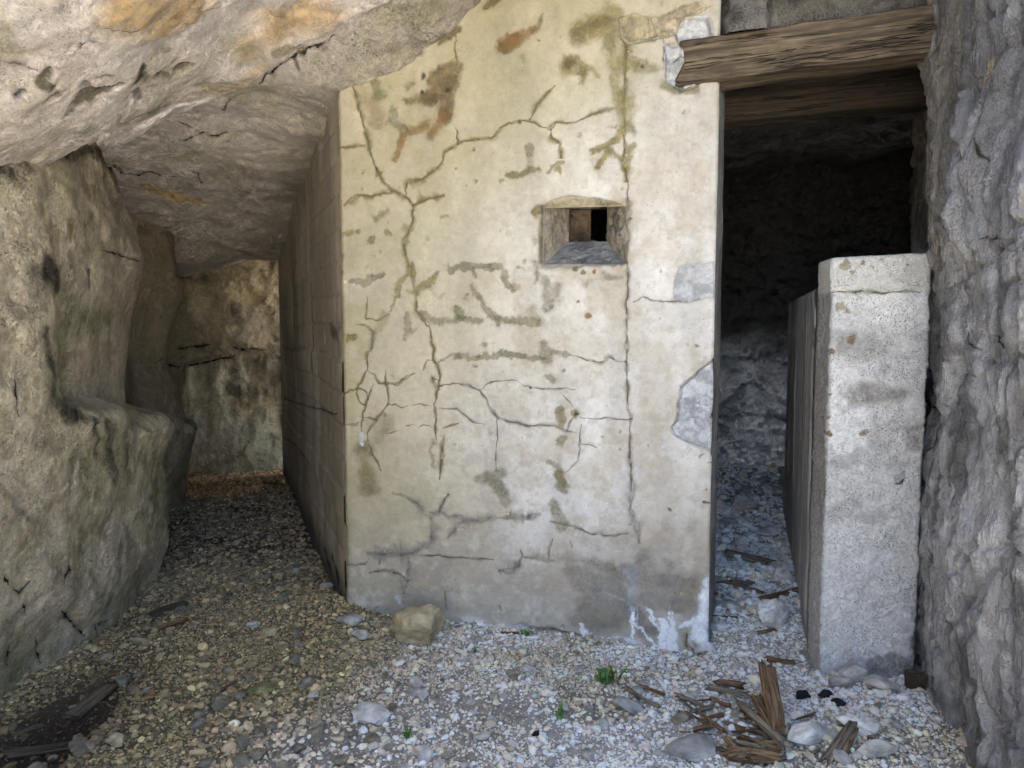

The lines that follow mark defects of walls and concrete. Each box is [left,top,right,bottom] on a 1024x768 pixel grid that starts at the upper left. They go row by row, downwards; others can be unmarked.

flaking render [619,2,714,92]
crack [284,16,683,576]
peeling [674,262,714,302]
crack [831,288,919,296]
flaking render [672,362,713,454]
water stain [567,555,709,651]